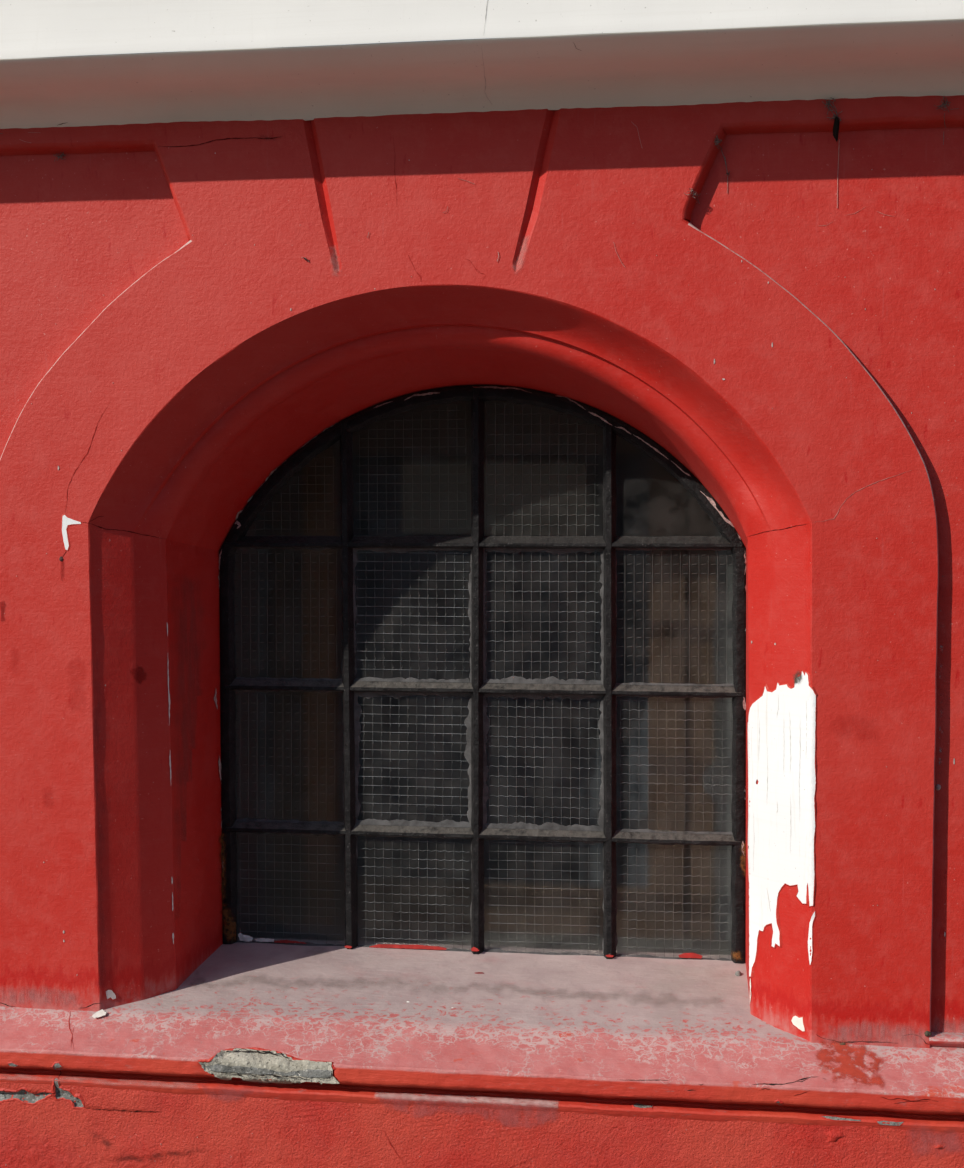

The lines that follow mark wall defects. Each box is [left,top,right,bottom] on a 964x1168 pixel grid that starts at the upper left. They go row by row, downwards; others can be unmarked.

crack [159,137,277,147]
peeling [557,395,690,476]
crack [65,402,165,539]
peeling [700,491,741,540]
peeling [735,670,818,1000]
peeling [0,1062,86,1110]
spalling [198,1047,340,1085]
peeling [817,1041,884,1086]